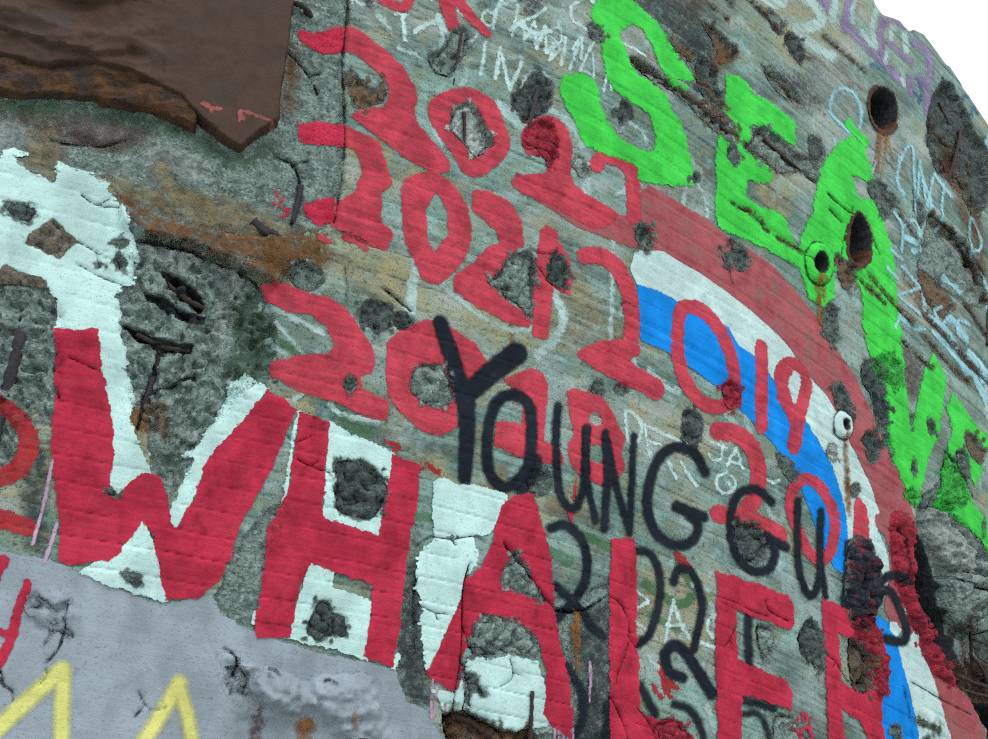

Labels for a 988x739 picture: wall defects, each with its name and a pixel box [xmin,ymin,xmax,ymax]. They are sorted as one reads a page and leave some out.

rust [0,56,197,177]
spalling [445,97,497,159]
rust [875,132,888,174]
spalling [925,74,988,220]
spalling [0,0,387,492]
rust [115,164,335,284]
spalling [486,247,576,319]
rust [816,272,827,324]
spalling [322,457,389,521]
spalling [286,595,351,644]
spalling [441,549,613,739]
spalling [844,428,988,704]